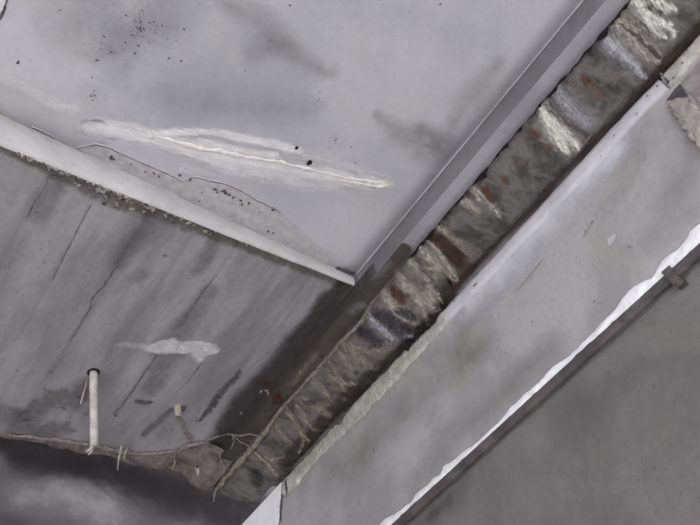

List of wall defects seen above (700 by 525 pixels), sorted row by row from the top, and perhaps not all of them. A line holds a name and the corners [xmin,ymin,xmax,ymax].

spalling [666,61,700,150]
efflorescence [81,122,391,189]
crack [52,205,91,280]
crack [69,214,150,341]
rust [390,286,405,304]
leakage [281,17,700,467]
crack [113,353,159,415]
leakage [0,243,416,525]
peeling [364,318,437,405]